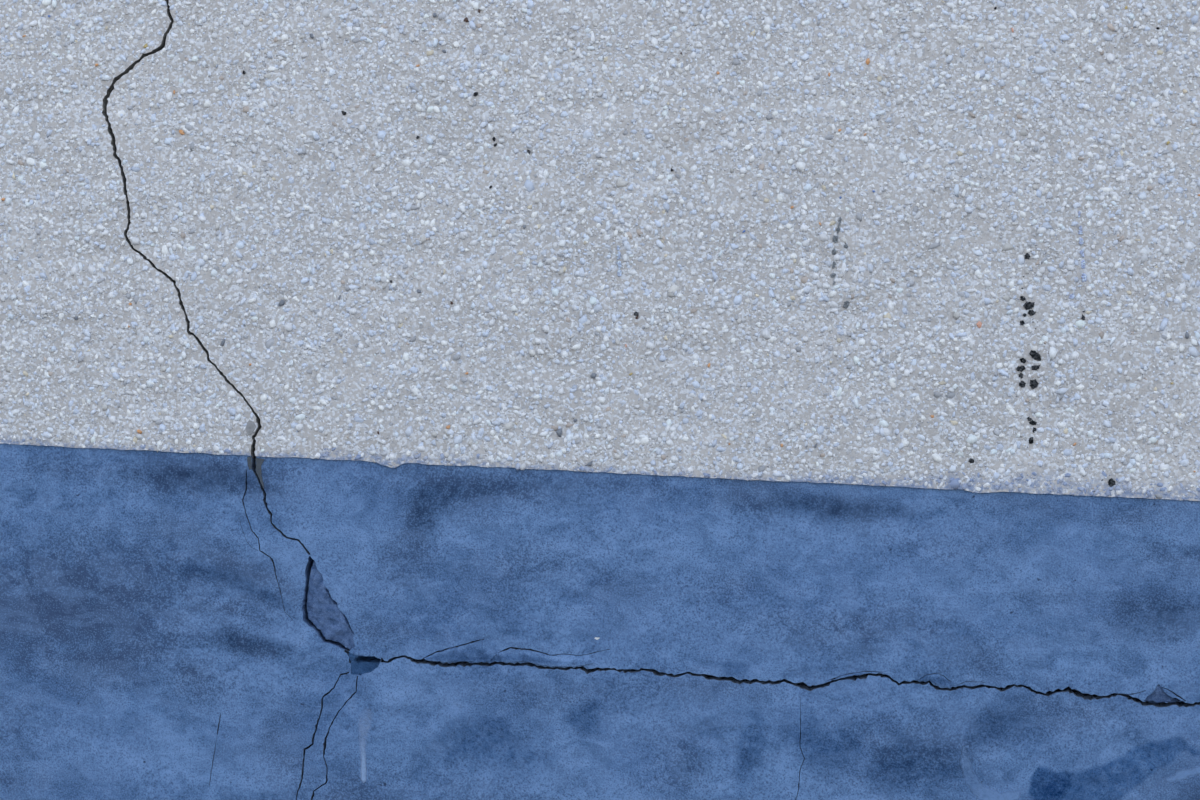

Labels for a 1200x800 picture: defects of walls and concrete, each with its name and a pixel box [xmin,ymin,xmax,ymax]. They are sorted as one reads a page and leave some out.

crack [102,0,310,620]
spalling [302,556,381,675]
crack [296,639,1200,800]